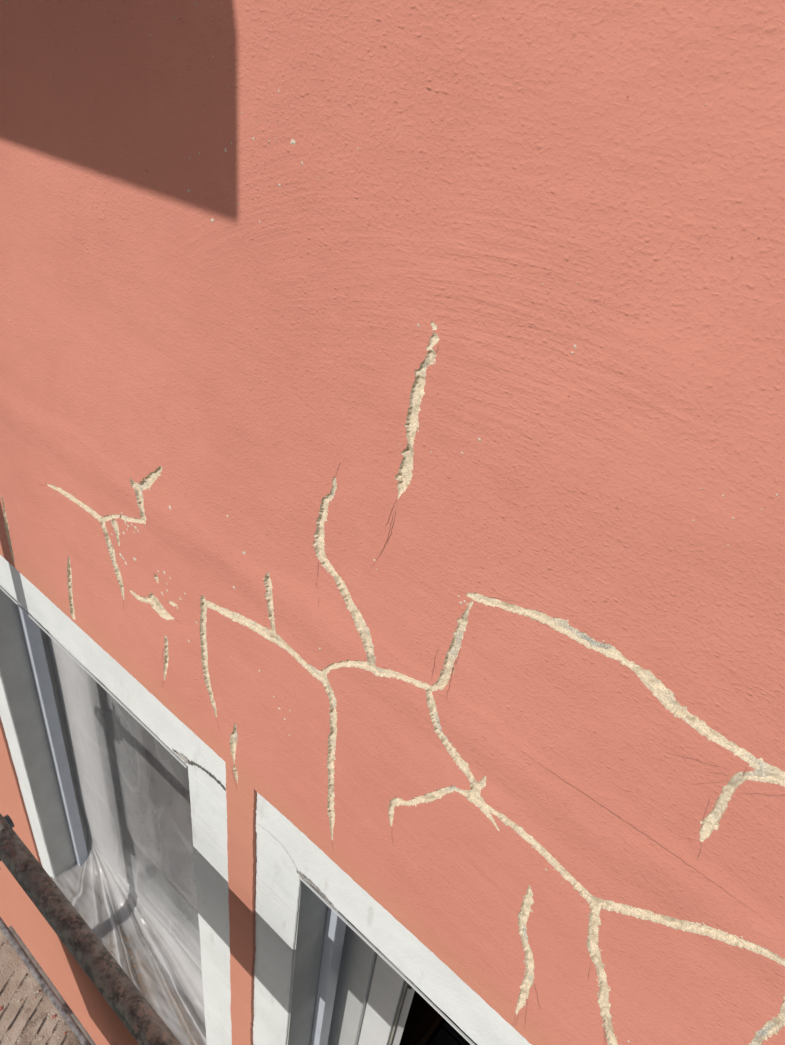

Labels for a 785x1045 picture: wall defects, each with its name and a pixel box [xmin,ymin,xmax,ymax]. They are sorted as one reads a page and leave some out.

crack [373,321,439,565]
crack [41,464,785,1045]